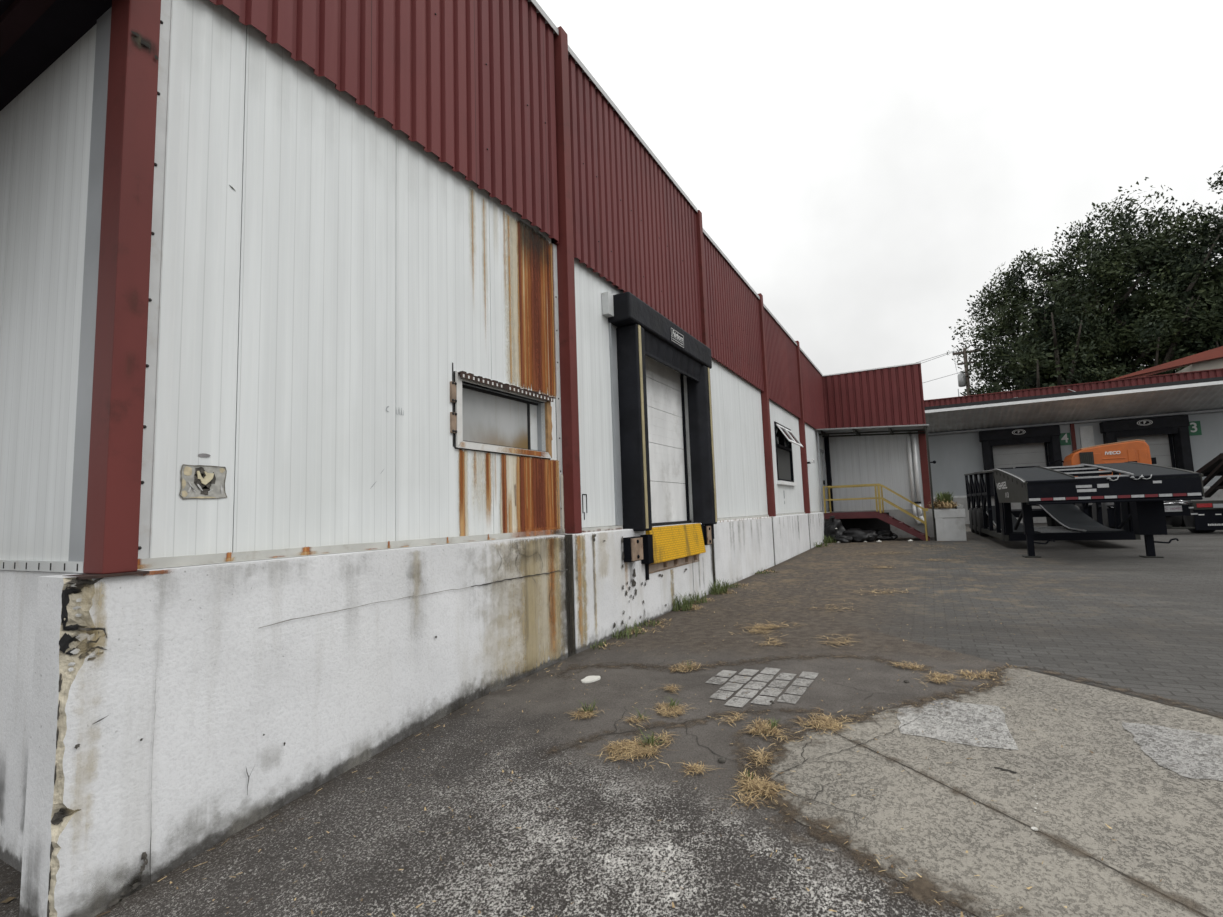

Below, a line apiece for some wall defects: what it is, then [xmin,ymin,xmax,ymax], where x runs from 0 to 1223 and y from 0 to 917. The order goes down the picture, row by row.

corrosion [472,190,485,276]
corrosion [506,215,557,396]
corrosion [432,448,564,545]
crack [260,541,568,628]
water stain [520,535,597,671]
spalling [47,577,107,917]